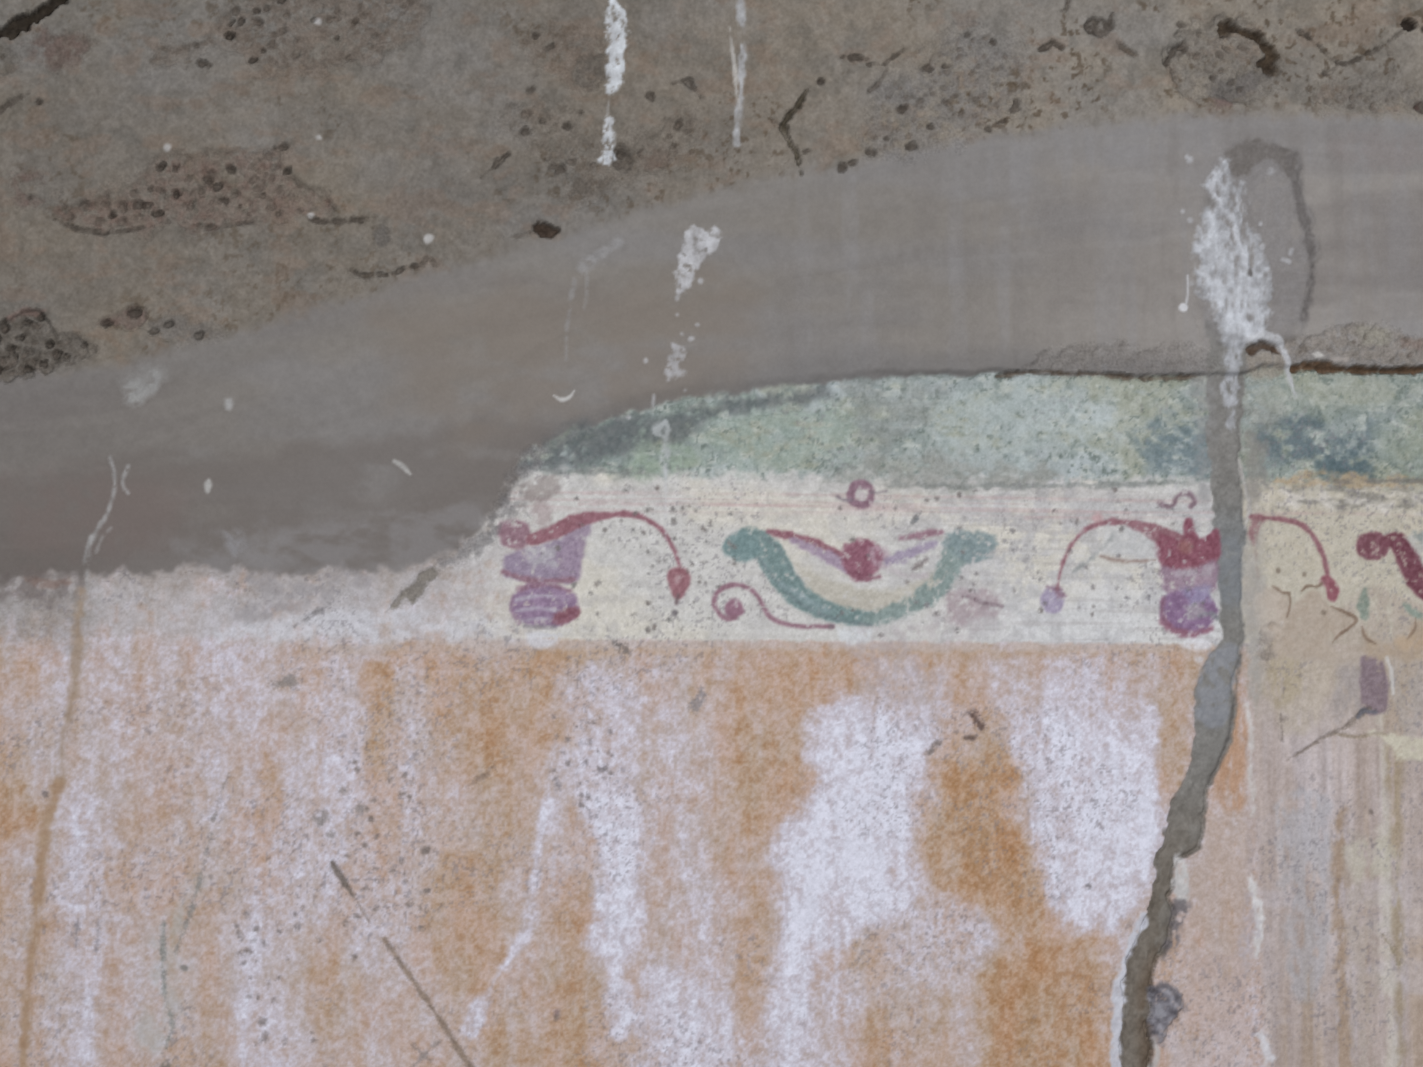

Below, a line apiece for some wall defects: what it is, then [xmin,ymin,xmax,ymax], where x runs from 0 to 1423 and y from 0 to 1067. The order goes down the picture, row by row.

spalling [44,137,378,244]
spalling [494,18,704,211]
water stain [595,0,633,167]
water stain [727,0,750,149]
spalling [1160,10,1423,122]
spalling [0,303,231,385]
water stain [531,223,845,545]
water stain [1176,152,1300,435]
spalling [1242,318,1423,383]
spalling [384,444,581,615]
water stain [827,583,1018,717]
crack [995,342,1423,1067]